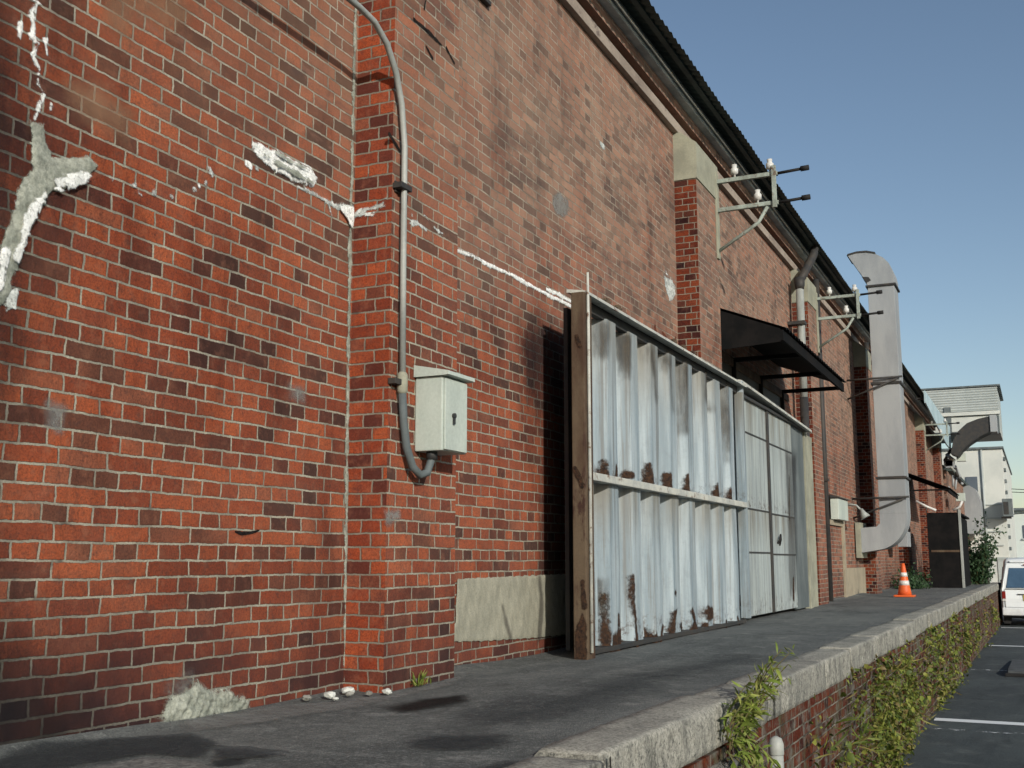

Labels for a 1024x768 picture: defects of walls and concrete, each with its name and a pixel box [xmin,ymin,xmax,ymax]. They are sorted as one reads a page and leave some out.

peeling [4,288,19,310]
rust [597,459,690,491]
rust [711,483,732,499]
rust [575,574,714,660]